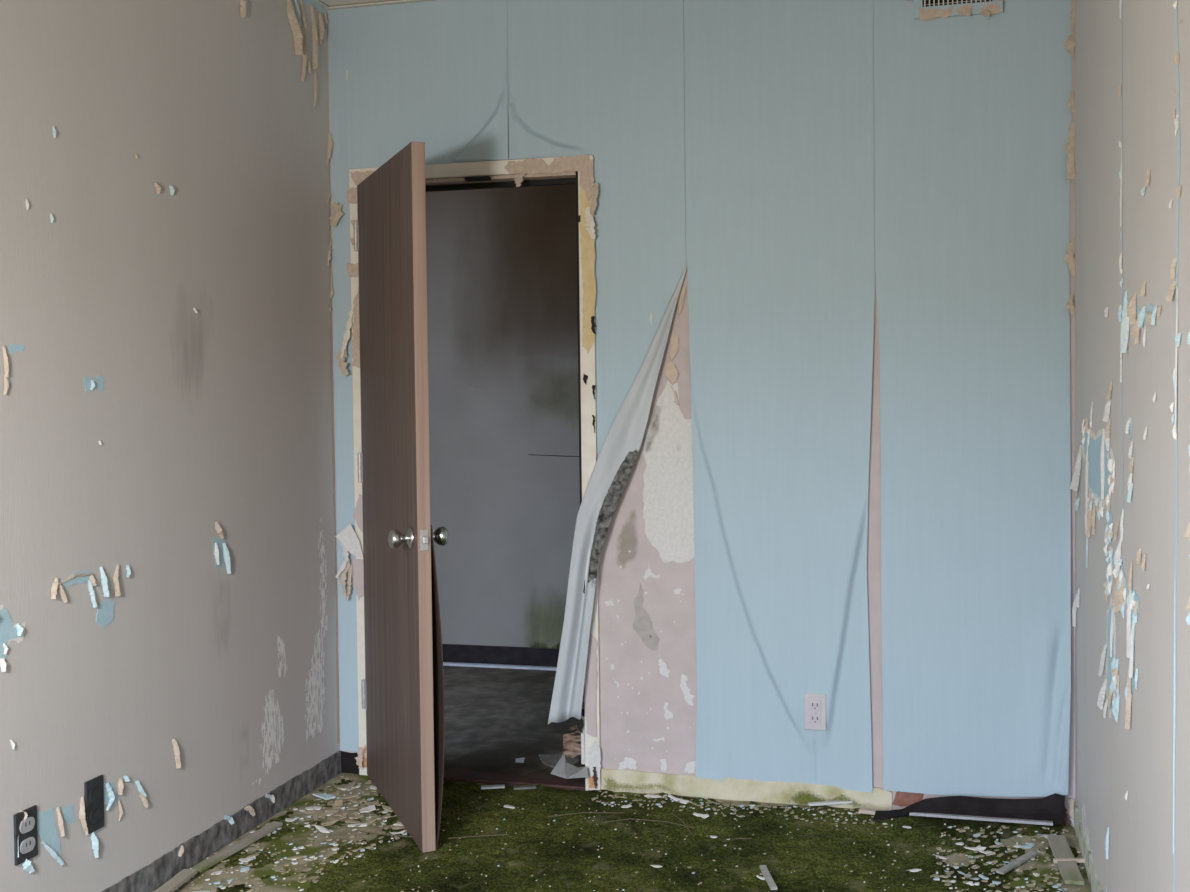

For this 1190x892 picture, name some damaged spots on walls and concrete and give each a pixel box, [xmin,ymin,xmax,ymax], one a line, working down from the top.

peeling [906,0,1003,20]
peeling [287,0,328,107]
peeling [585,207,596,239]
peeling [336,311,354,376]
peeling [1069,0,1190,892]
peeling [606,381,695,706]
peeling [0,605,26,672]